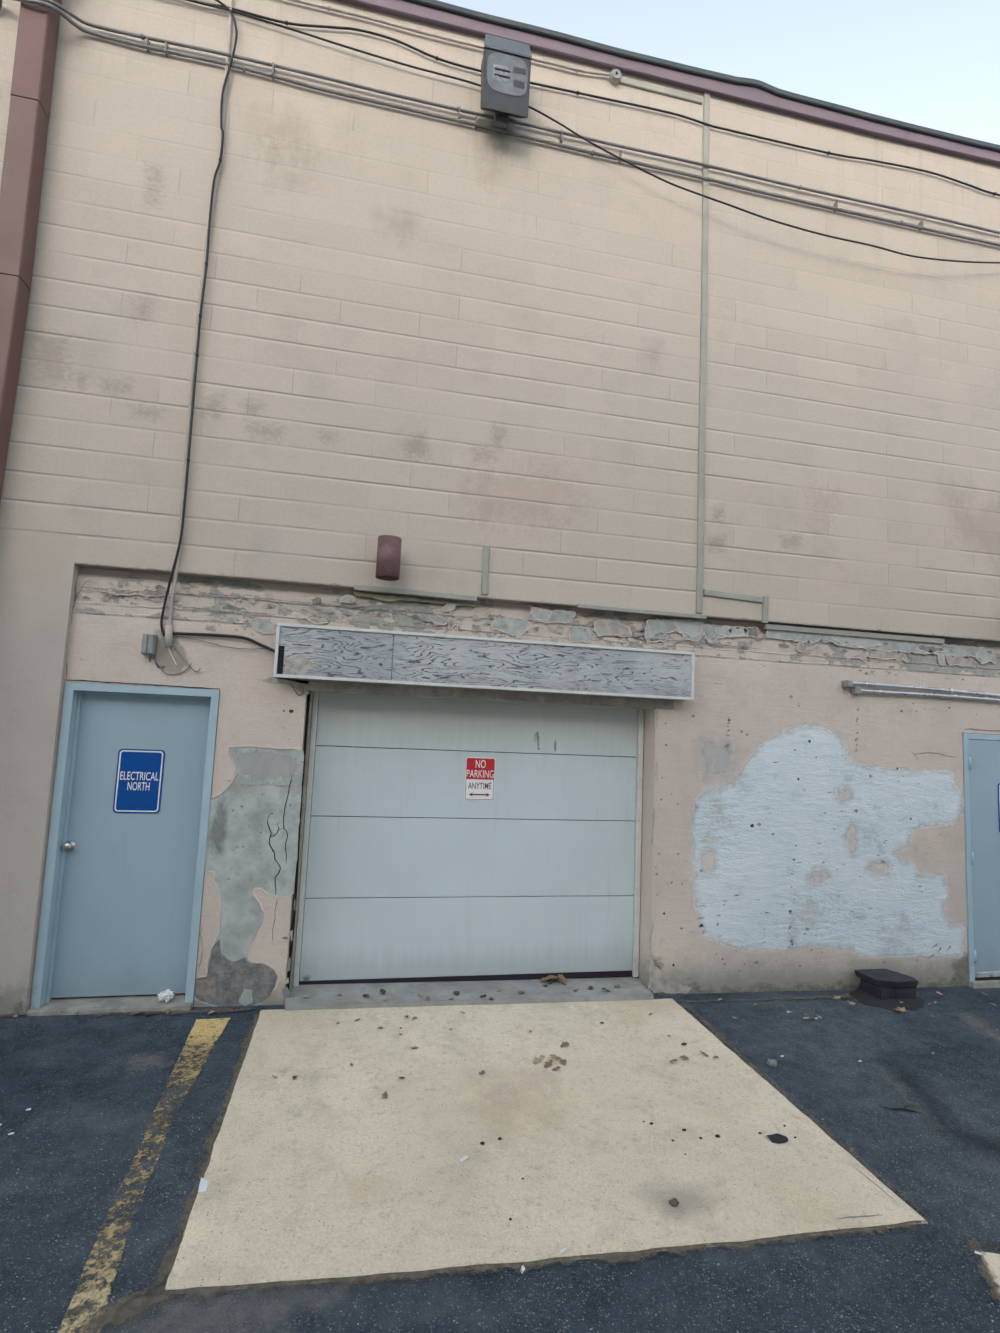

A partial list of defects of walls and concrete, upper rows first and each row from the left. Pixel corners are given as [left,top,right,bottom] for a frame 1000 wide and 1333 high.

peeling [82,564,274,636]
peeling [307,583,1000,681]
peeling [194,745,304,1007]
crack [267,773,292,941]